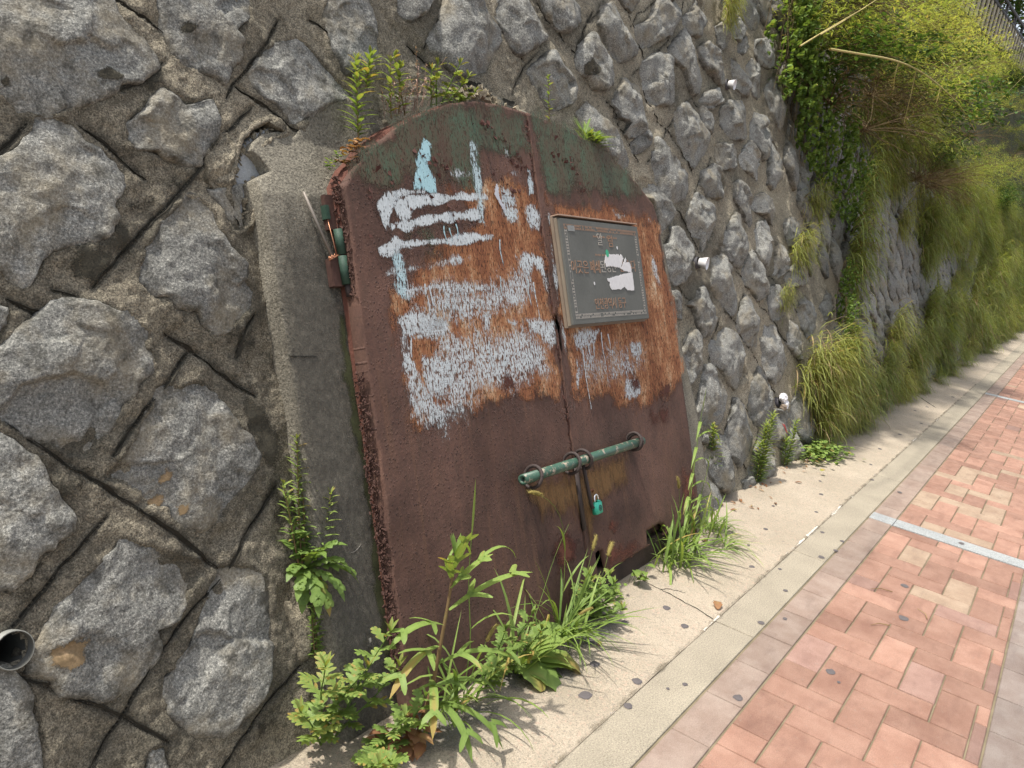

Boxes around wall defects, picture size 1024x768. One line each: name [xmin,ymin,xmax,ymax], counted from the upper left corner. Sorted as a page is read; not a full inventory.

corrosion [330,176,358,301]
peeling [348,99,533,259]
corrosion [388,114,684,450]
corrosion [352,371,407,680]
corrosion [528,459,627,545]
crack [638,577,715,620]